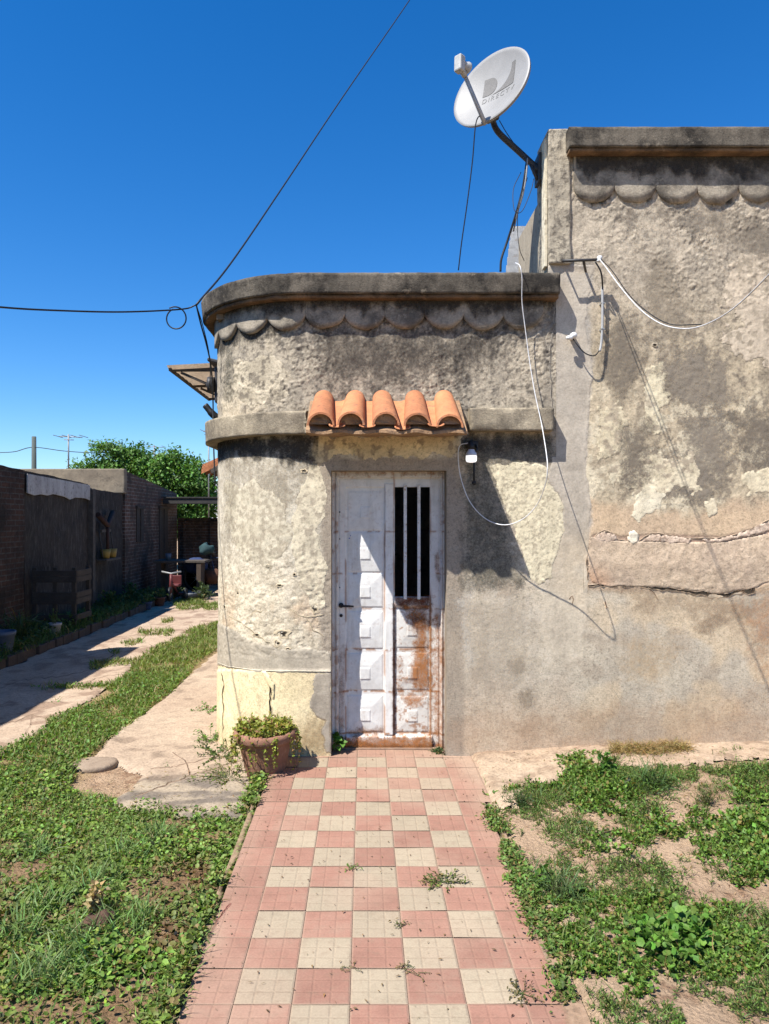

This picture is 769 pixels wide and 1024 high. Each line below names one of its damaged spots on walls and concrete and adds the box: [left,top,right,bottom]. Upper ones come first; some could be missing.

peeling [489,462,565,585]
spalling [643,521,769,543]
rust [345,595,444,748]